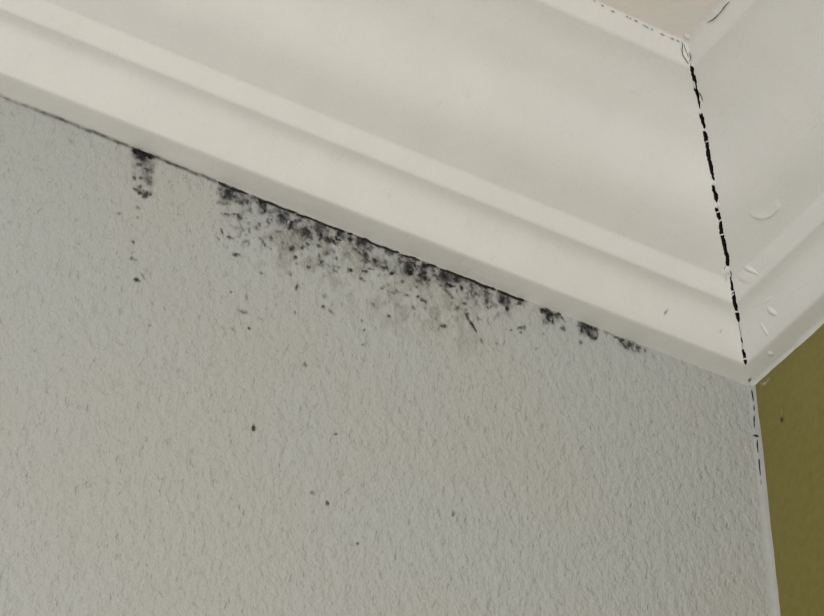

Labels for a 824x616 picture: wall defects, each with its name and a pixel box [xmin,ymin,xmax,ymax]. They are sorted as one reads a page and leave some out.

water stain [135,149,152,171]
water stain [219,183,522,311]
crack [218,181,543,308]
crack [594,0,747,365]